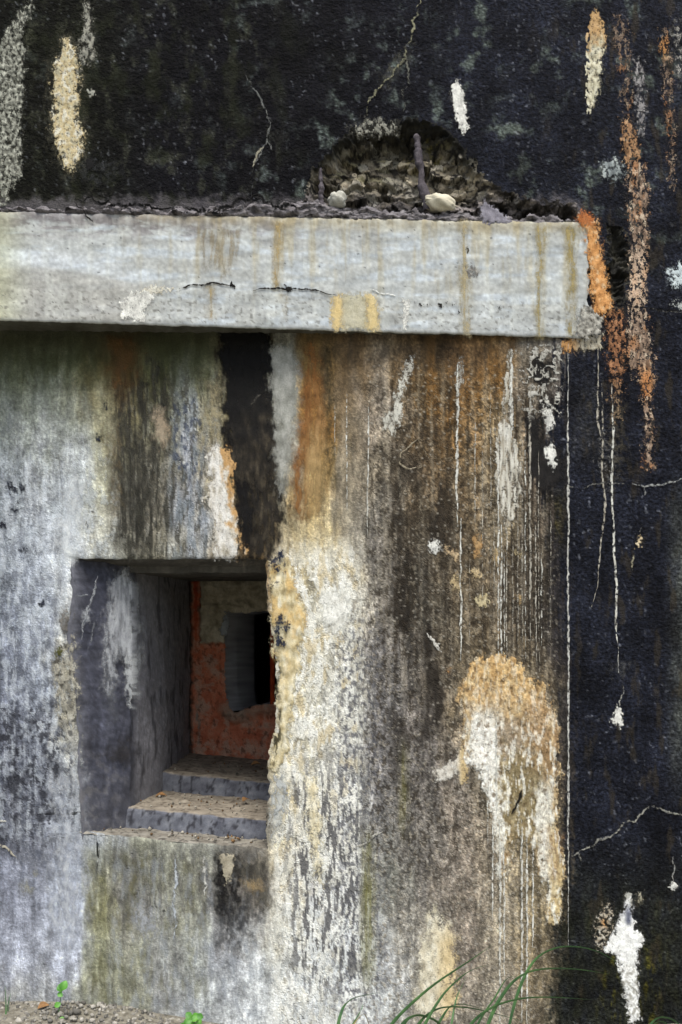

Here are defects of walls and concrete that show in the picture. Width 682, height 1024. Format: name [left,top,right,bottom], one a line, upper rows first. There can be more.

crack [364,0,421,123]
crack [75,79,302,222]
spalling [301,79,580,226]
crack [179,281,335,295]
rust [329,292,380,332]
rust [561,13,658,473]
damp [214,332,290,561]
rust [293,342,334,519]
damp [593,355,619,673]
damp [454,343,570,944]
damp [202,853,272,943]
crack [572,807,682,861]